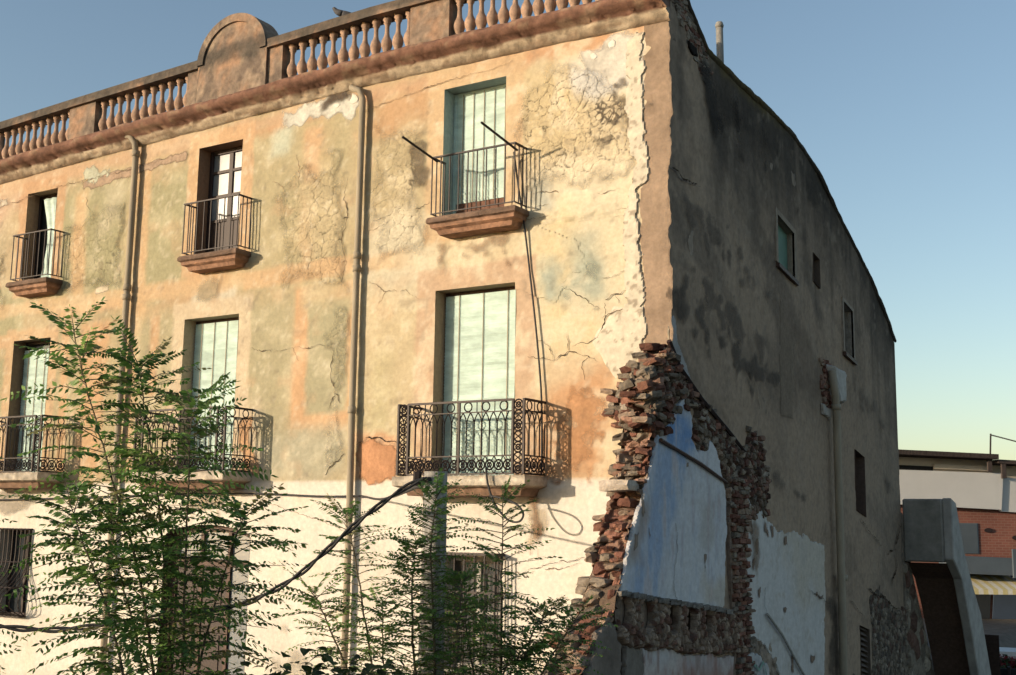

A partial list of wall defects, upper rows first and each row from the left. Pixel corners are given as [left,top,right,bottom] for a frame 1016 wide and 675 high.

flaking render [283,93,359,128]
crack [516,67,633,220]
flaking render [580,0,714,352]
leakage [701,62,723,135]
crack [254,131,427,474]
crack [532,271,624,379]
leakage [666,276,780,390]
flaking render [819,357,847,420]
flaking render [355,439,396,485]
flaking render [553,388,656,550]
spalling [544,545,624,675]
flaking render [746,636,779,675]